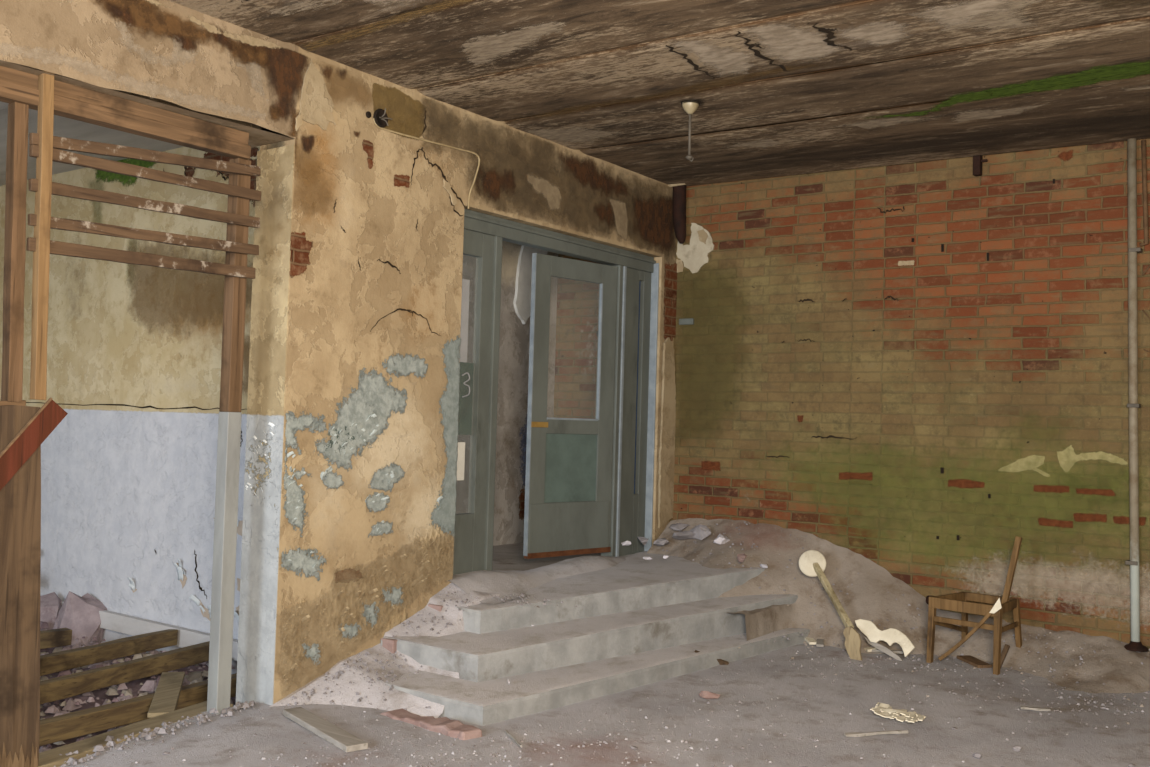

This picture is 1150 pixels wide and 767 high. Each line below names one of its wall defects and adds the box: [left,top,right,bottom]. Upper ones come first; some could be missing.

crack [666,45,715,79]
crack [735,31,789,72]
crack [808,22,852,51]
crack [411,107,465,216]
flaking render [290,232,313,278]
crack [358,259,401,274]
flaking render [664,223,714,341]
flaking render [948,479,984,488]
flaking render [998,445,1128,496]
peeling [253,334,461,691]
flaking render [1038,513,1146,528]